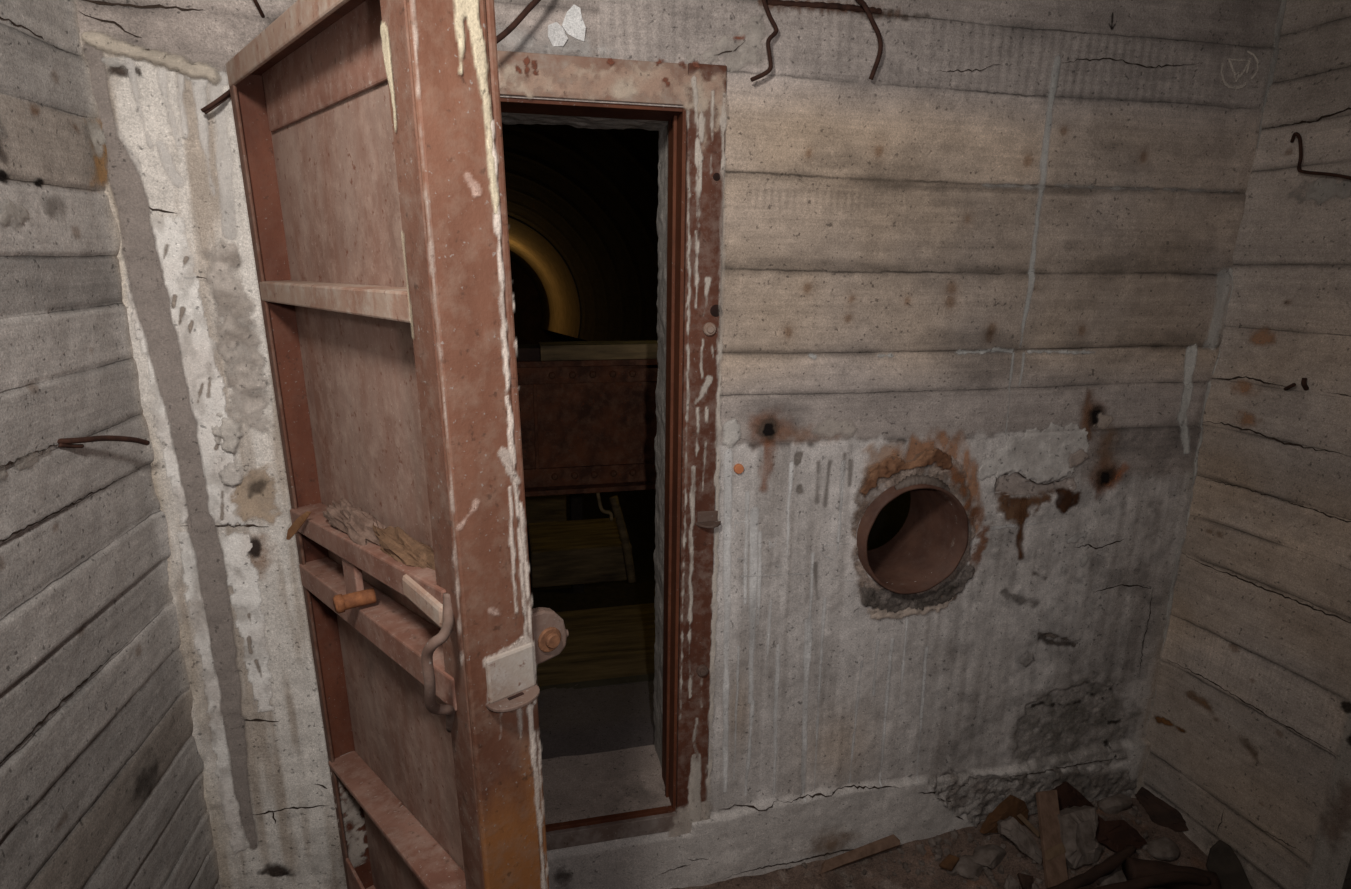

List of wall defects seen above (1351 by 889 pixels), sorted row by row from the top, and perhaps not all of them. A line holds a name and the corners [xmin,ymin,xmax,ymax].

crack [0,17,69,53]
rust [516,56,538,76]
crack [1266,107,1351,129]
rust [758,418,777,439]
rust [1082,395,1123,486]
crack [0,476,125,541]
spalling [852,422,1089,620]
crack [0,640,130,764]
crack [1011,757,1126,777]
crack [720,785,965,819]